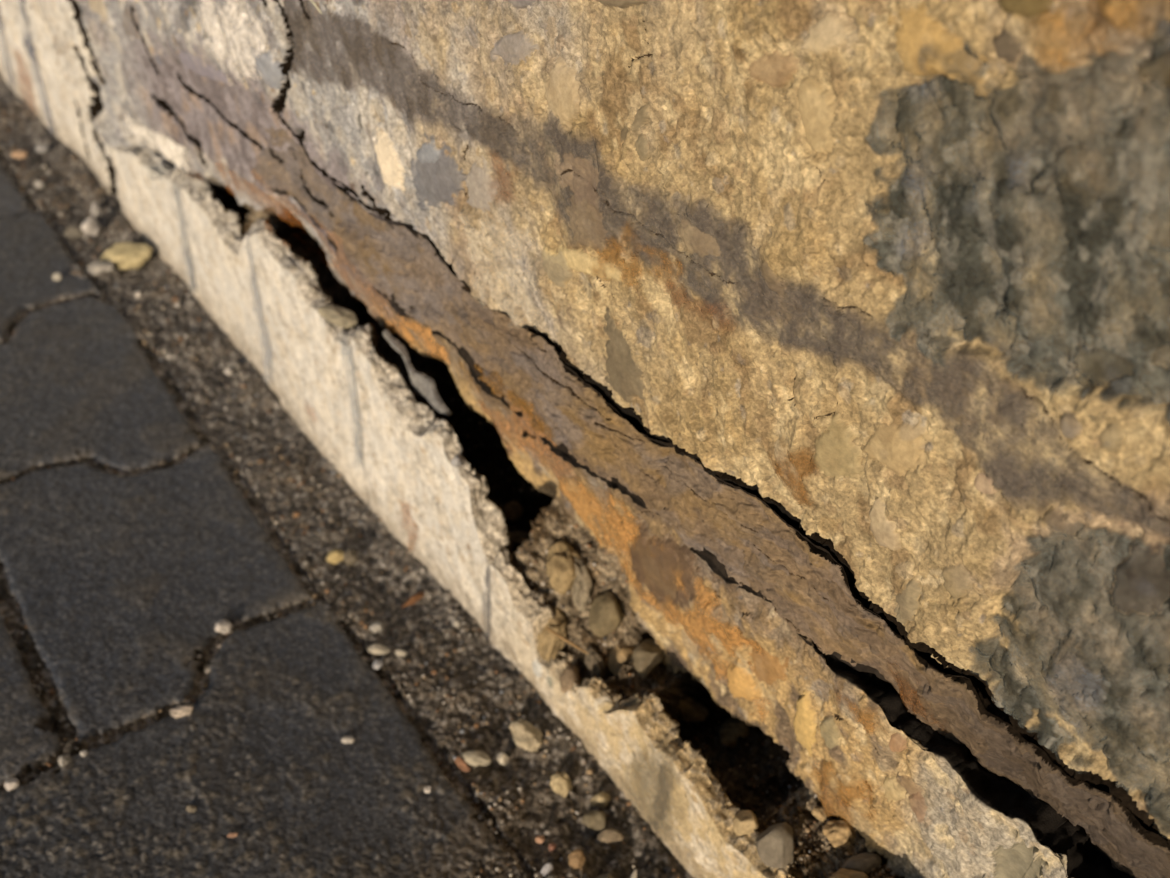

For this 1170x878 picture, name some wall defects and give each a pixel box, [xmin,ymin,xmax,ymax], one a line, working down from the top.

crack [69,0,122,208]
spalling [75,0,434,353]
crack [130,0,392,221]
rust [264,210,330,268]
rust [385,317,449,361]
water stain [863,43,1170,425]
spalling [1053,97,1103,191]
water stain [1150,21,1170,60]
rust [558,480,758,676]
spalling [162,126,1170,878]
crack [498,320,1170,851]
water stain [973,524,1170,835]